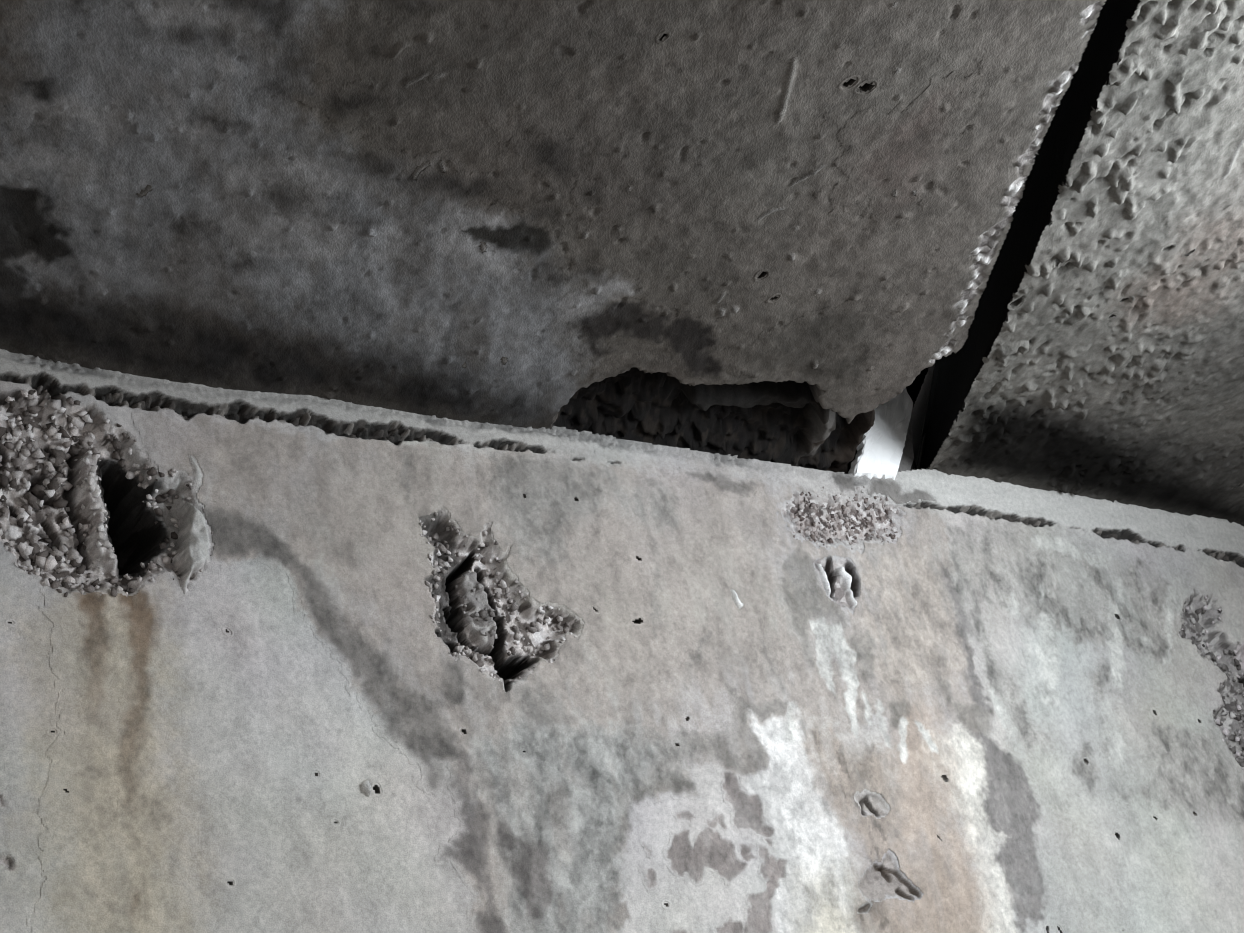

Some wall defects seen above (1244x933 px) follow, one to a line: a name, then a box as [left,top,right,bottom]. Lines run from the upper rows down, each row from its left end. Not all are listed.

spalling [0,383,215,597]